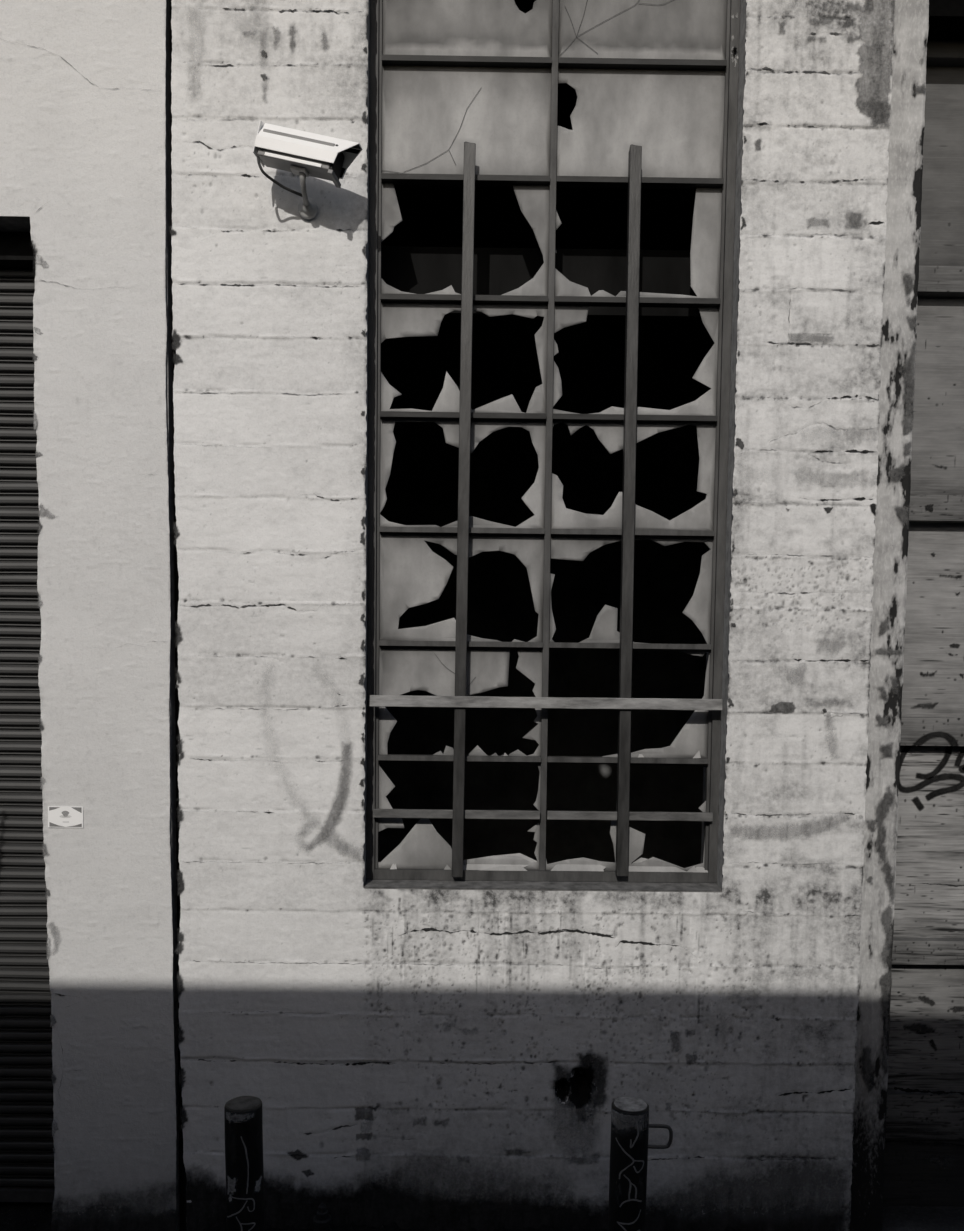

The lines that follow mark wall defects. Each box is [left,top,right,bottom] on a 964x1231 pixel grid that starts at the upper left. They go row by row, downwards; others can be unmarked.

leakage [261,26,295,58]
peeling [890,274,917,482]
peeling [896,507,909,523]
peeling [876,618,902,654]
peeling [879,677,899,700]
peeling [880,744,892,757]
crack [186,928,693,969]
peeling [861,787,937,1092]
spalling [554,1068,594,1108]
leakage [355,1106,379,1160]
leakage [264,1158,609,1231]
leakage [645,1163,849,1231]